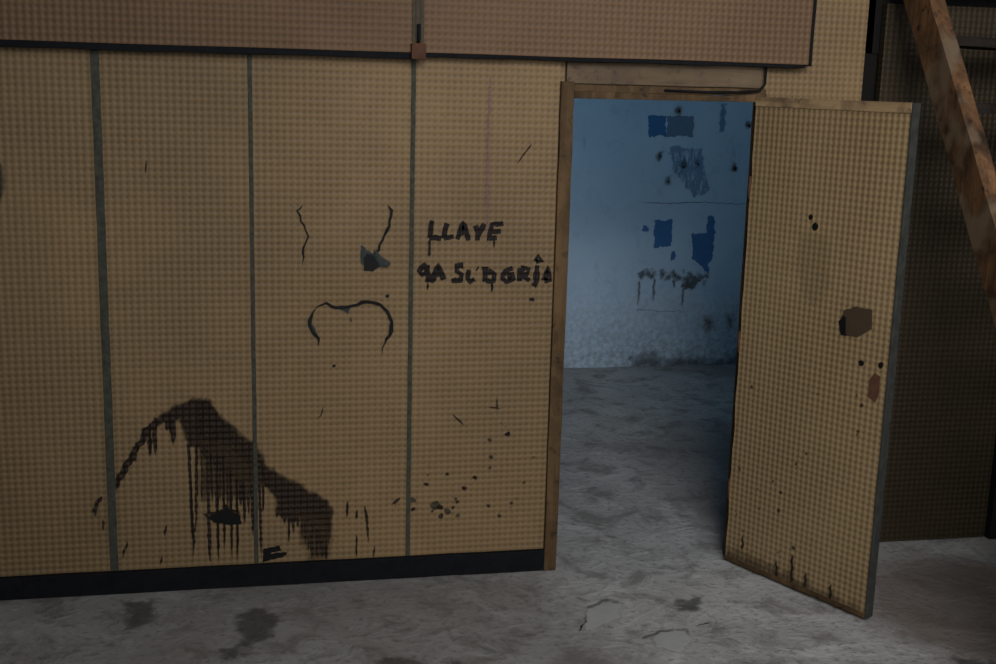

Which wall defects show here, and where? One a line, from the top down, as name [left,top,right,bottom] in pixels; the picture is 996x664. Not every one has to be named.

leakage [638,270,708,303]
leakage [115,399,333,560]
leakage [346,501,375,557]